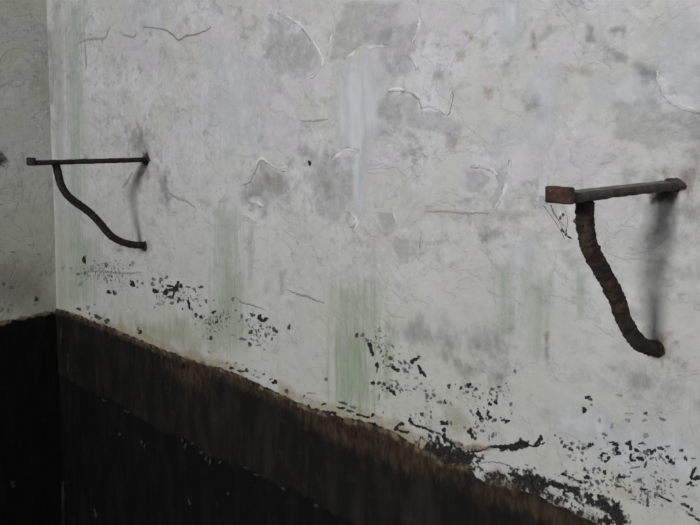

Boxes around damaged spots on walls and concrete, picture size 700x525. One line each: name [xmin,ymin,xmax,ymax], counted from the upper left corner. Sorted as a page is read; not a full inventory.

crack [74,26,211,65]
flaking render [387,0,454,116]
damp [70,313,241,378]
damp [259,386,467,469]